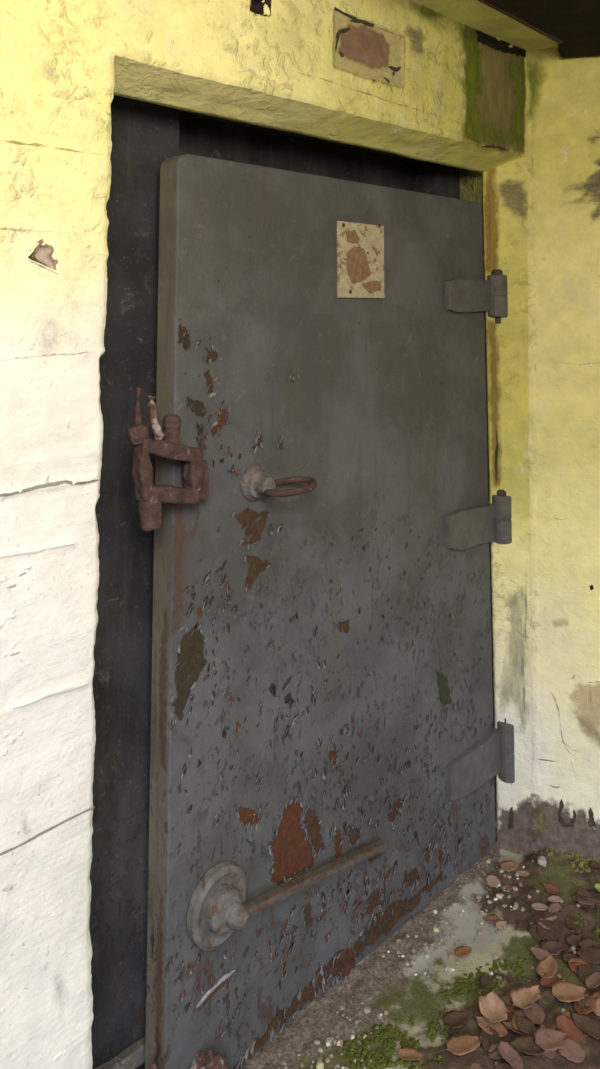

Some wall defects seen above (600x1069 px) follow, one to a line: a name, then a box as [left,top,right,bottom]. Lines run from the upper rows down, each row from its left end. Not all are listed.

spalling [333,7,405,87]
water stain [463,33,525,143]
water stain [575,163,600,218]
spalling [26,239,58,274]
peeling [187,397,242,476]
crack [0,475,101,502]
peeling [170,560,339,816]
crack [0,807,94,856]
corrosion [235,805,259,833]
corrosion [268,795,363,885]
water stain [494,795,600,861]
corrosion [235,843,449,1069]